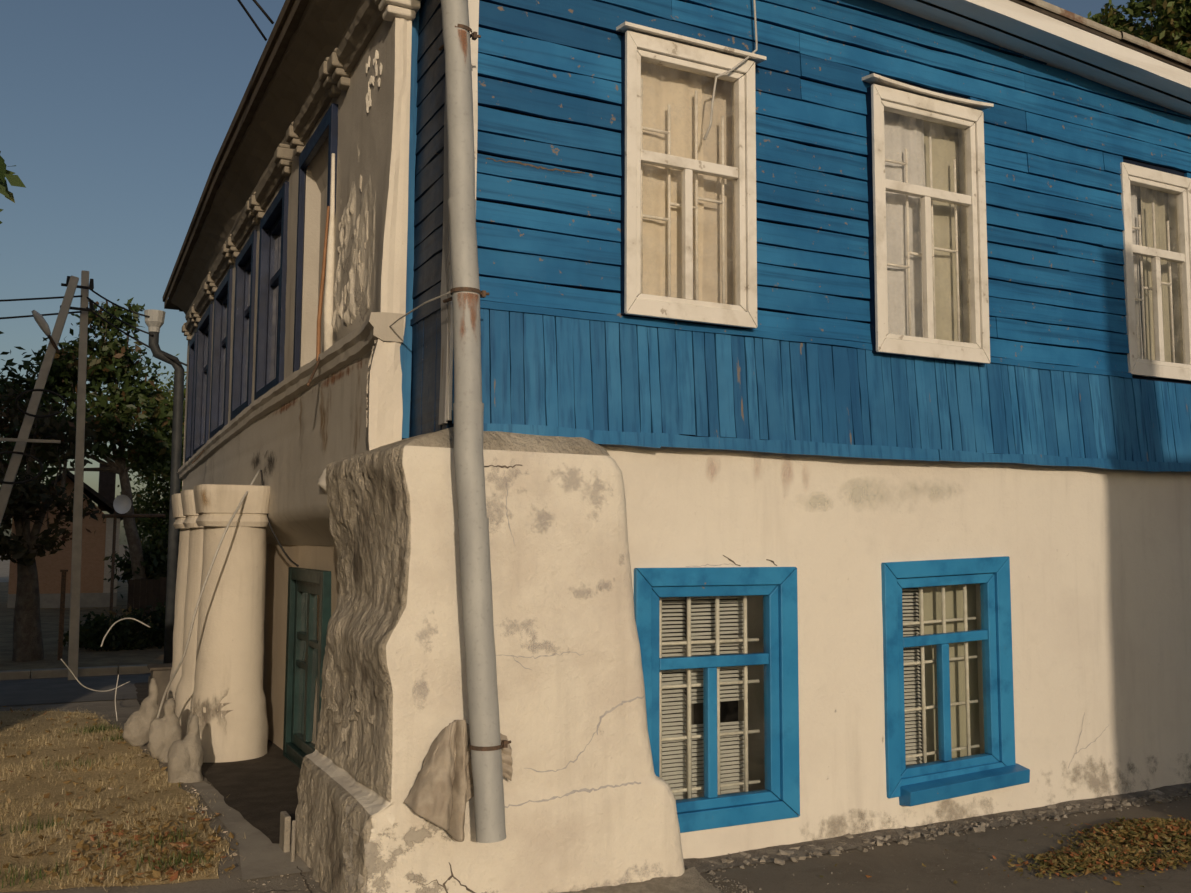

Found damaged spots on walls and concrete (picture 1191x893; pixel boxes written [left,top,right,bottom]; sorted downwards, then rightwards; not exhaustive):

peeling [365,50,382,113]
peeling [332,144,376,335]
crack [505,696,644,808]
crack [415,863,475,893]